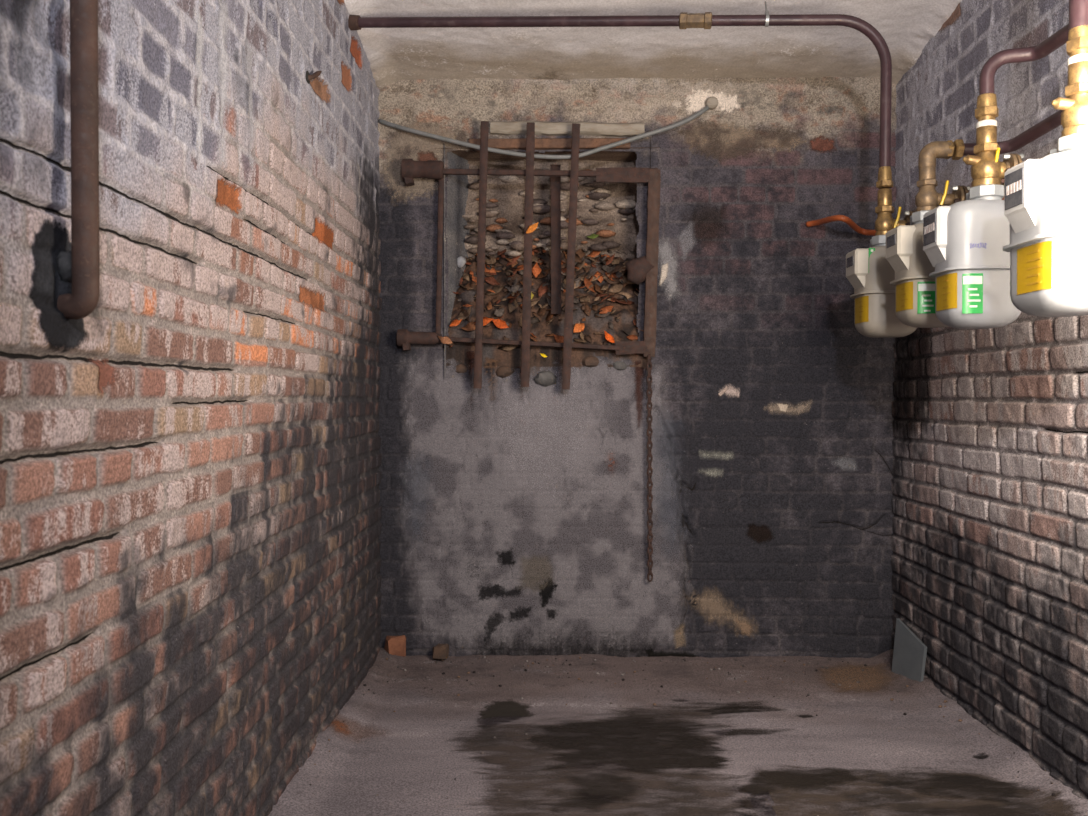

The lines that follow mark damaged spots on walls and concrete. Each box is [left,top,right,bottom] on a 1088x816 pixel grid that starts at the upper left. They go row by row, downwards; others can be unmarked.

crack [0,138,71,172]
crack [0,190,71,218]
crack [99,166,312,279]
crack [243,311,294,324]
crack [0,351,232,371]
crack [172,398,247,406]
water stain [680,592,751,635]
water stain [453,701,1080,816]